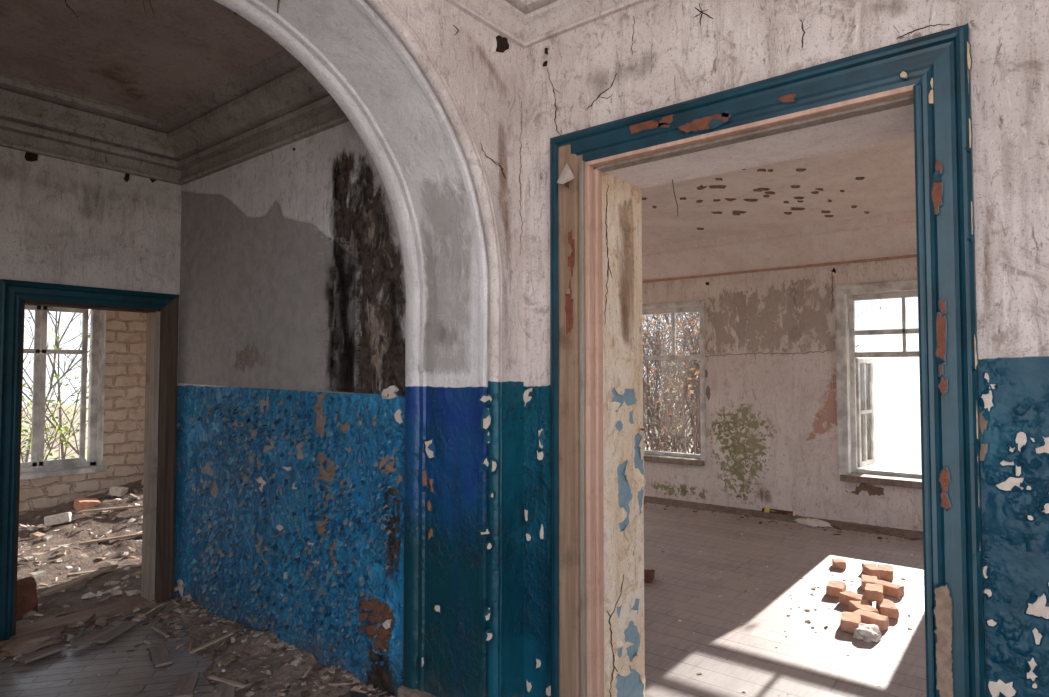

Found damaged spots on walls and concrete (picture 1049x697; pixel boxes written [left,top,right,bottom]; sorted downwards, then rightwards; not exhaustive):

peeling [628,111,732,135]
peeling [680,178,844,217]
water stain [178,163,395,394]
flaking render [704,280,836,352]
peeling [968,333,1049,510]
peeling [174,385,405,669]
peeling [418,438,436,541]
peeling [610,387,647,564]
peeling [972,541,994,600]
peeling [1026,489,1049,522]
peeling [616,599,646,697]
peeling [985,580,1049,697]